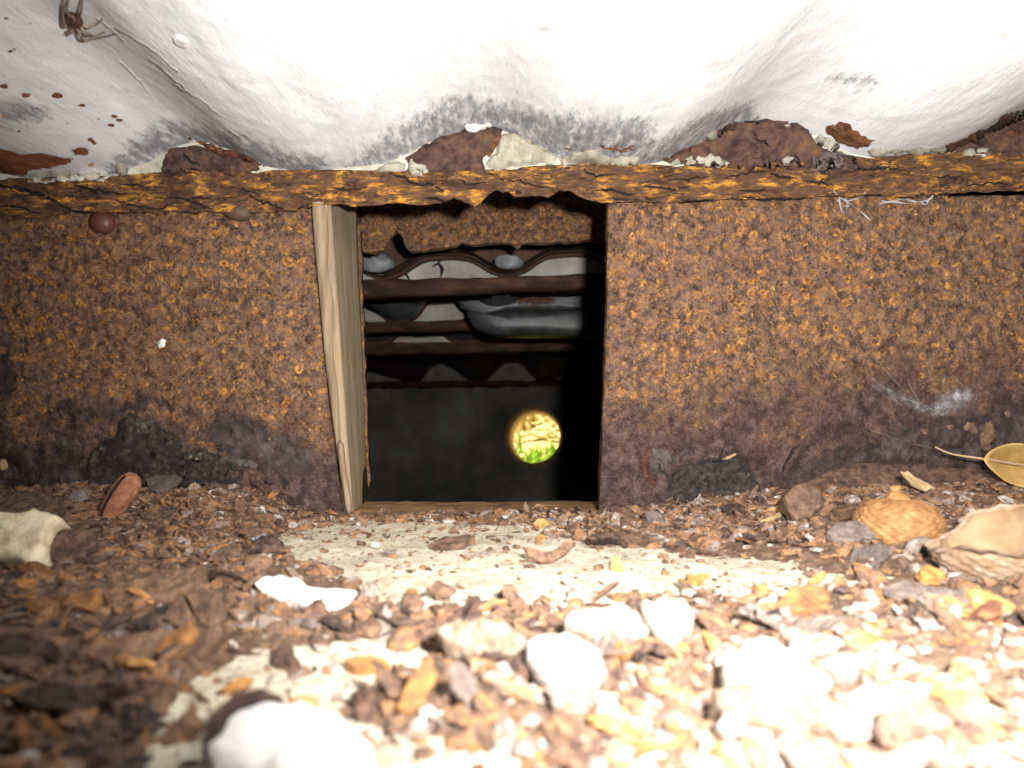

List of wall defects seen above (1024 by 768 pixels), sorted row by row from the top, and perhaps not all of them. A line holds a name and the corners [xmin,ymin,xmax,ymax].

peeling [108,121,326,177]
peeling [352,95,875,174]
spalling [945,110,1024,155]
crack [0,183,213,215]
crack [236,187,312,213]